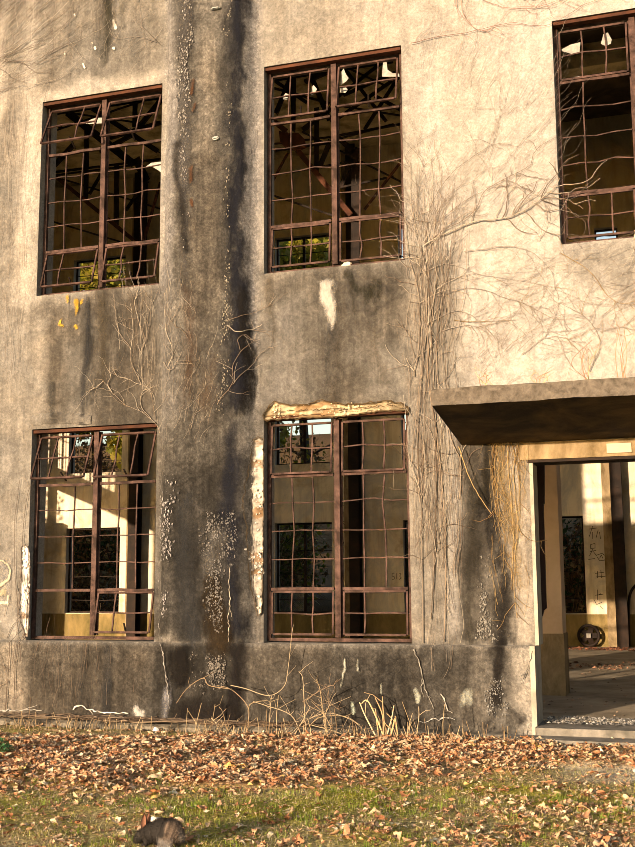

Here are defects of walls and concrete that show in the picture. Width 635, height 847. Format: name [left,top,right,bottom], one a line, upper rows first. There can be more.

leakage [222,0,257,411]
flaking render [262,399,409,422]
flaking render [18,545,31,639]
leakage [164,427,248,721]
flaking render [198,436,265,633]